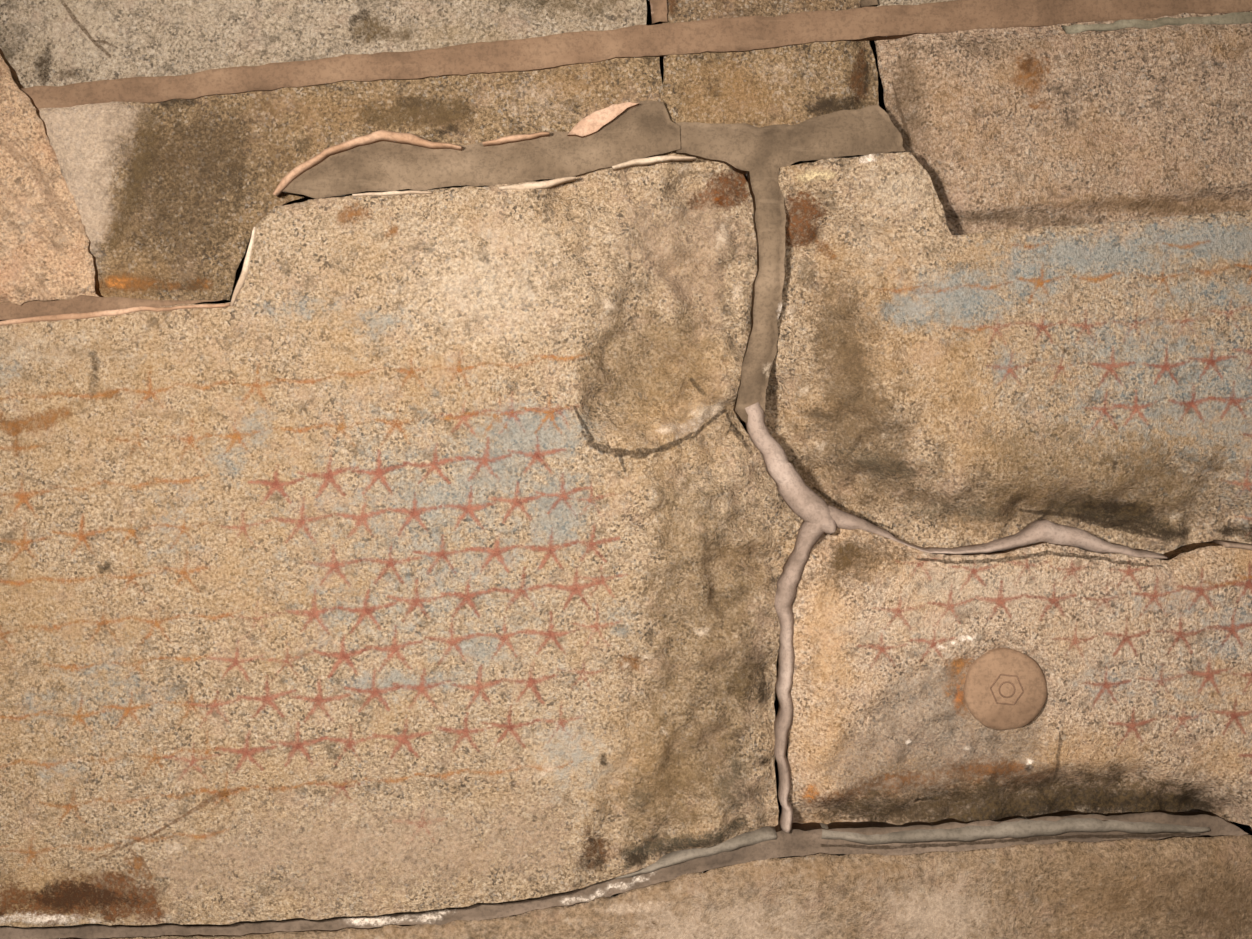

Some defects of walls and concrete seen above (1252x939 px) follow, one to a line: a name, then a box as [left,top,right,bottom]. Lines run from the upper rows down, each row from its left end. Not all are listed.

damp [108,99,246,263]
crack [573,378,751,472]
damp [1043,496,1186,540]
damp [960,787,1232,822]
damp [621,819,744,869]
rust [0,858,163,925]